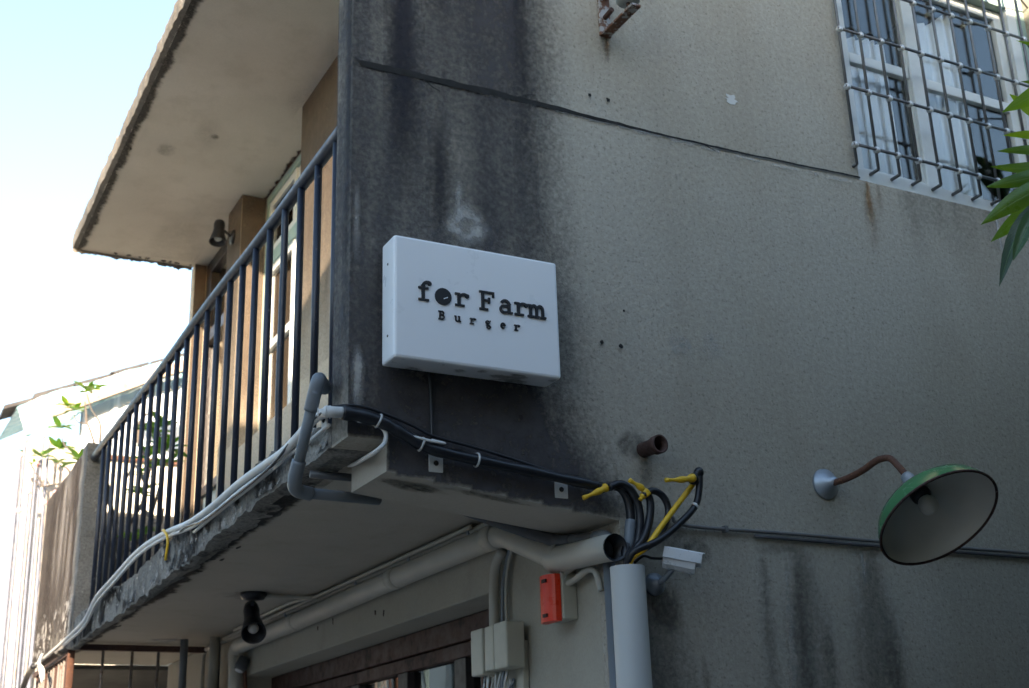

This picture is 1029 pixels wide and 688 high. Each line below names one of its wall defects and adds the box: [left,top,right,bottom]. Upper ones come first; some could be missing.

crack [355,57,860,178]
damp [300,0,615,515]
damp [32,455,136,662]
spalling [0,433,302,688]
damp [150,264,222,585]
damp [234,472,279,505]